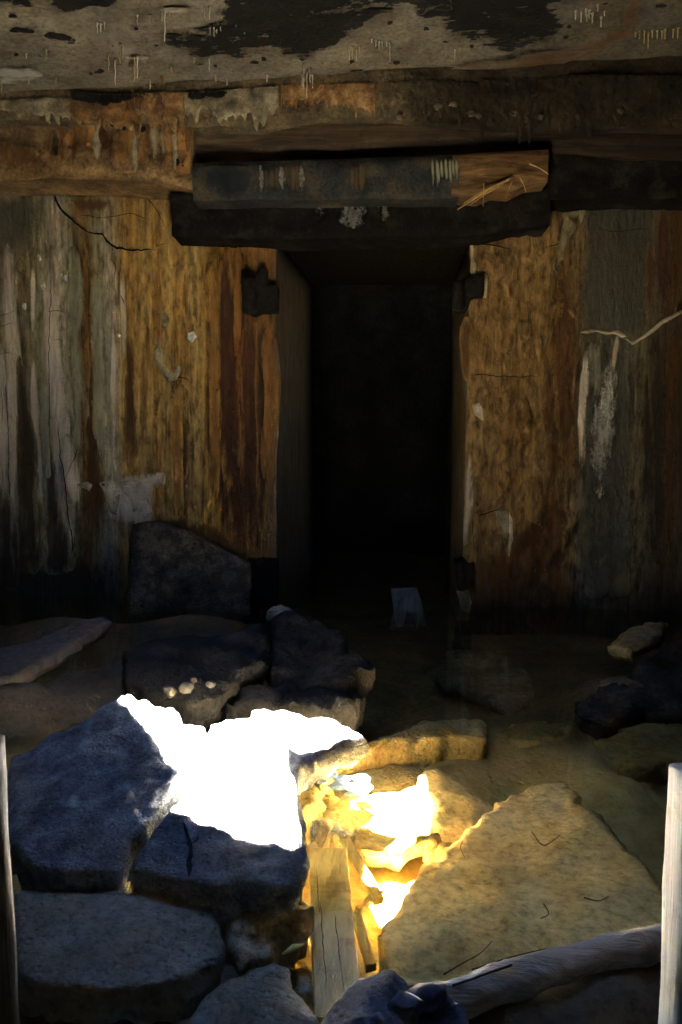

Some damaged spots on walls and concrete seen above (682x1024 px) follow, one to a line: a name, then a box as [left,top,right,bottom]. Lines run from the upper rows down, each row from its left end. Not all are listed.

crack [54,195,166,315]
water stain [556,209,682,599]
water stain [463,452,474,547]